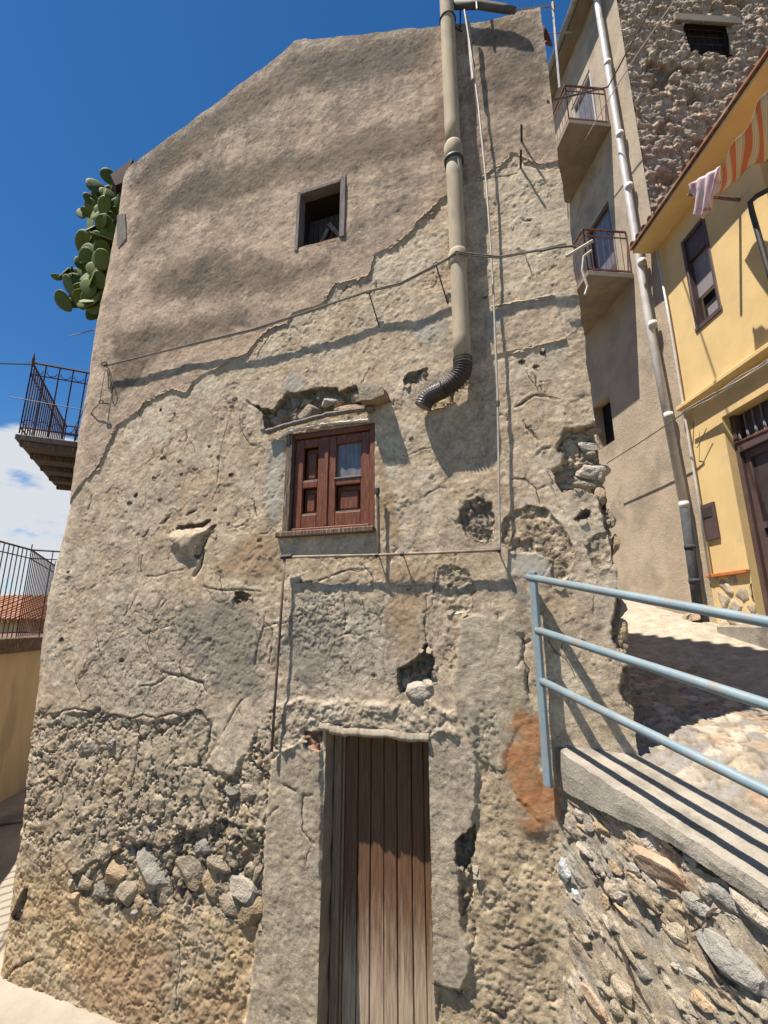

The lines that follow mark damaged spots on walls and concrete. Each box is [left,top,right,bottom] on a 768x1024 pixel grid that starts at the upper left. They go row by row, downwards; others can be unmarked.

spalling [255,385,363,435]
spalling [403,368,428,389]
spalling [452,421,621,591]
crack [54,402,301,782]
spalling [433,560,477,617]
spalling [397,644,437,701]
spalling [223,784,256,802]
corrosion [502,708,564,835]
spalling [67,814,264,934]
spalling [448,824,481,918]